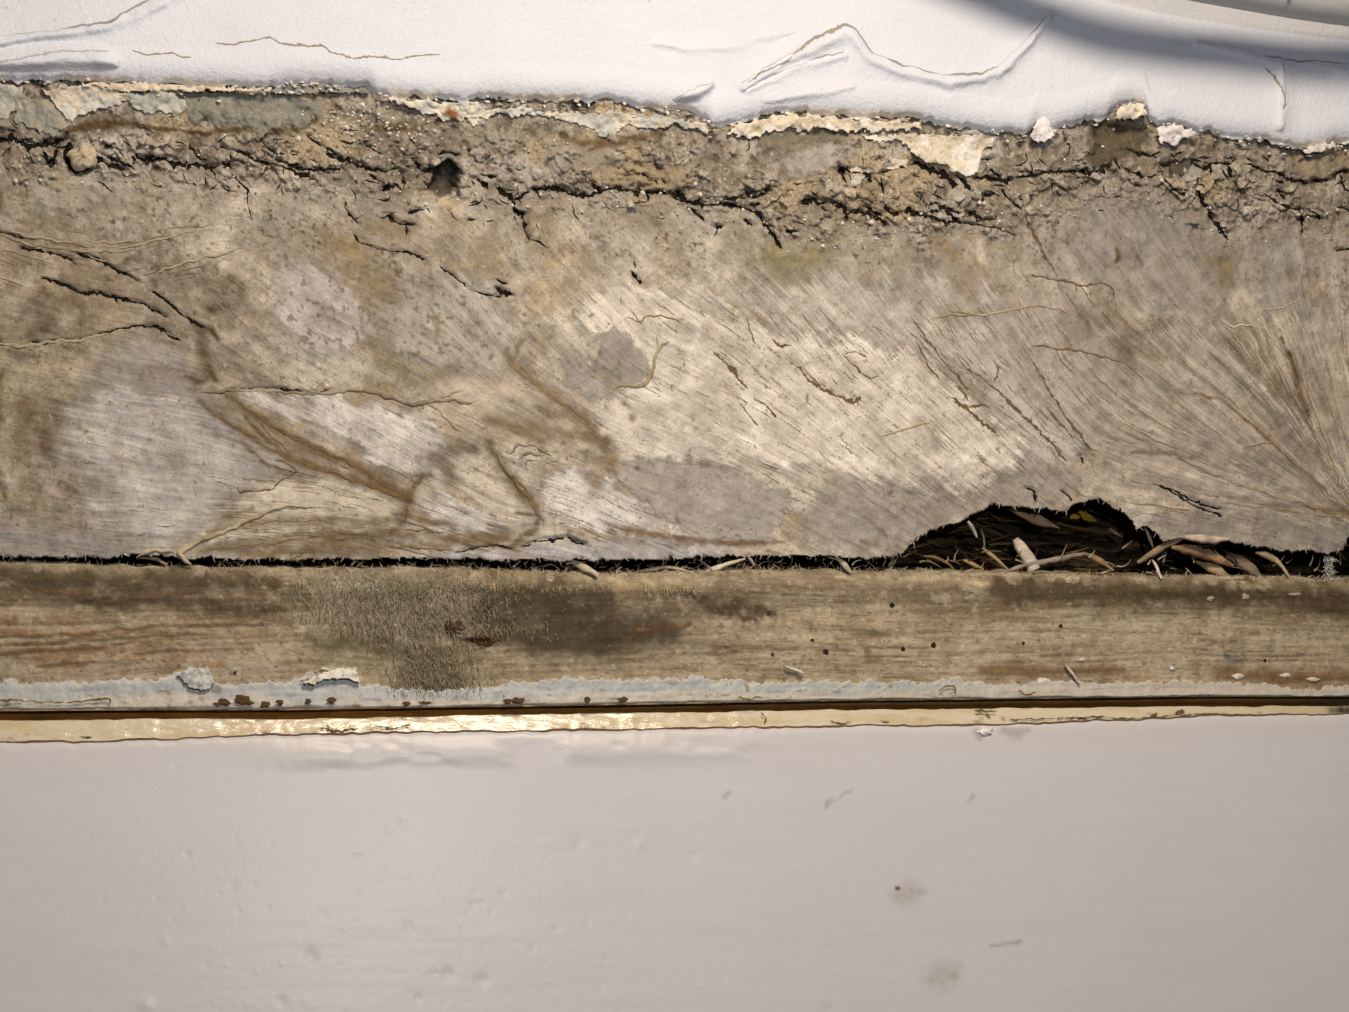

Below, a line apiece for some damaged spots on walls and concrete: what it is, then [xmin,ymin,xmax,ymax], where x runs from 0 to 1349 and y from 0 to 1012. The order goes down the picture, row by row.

spalling [0,79,1349,244]
crack [0,110,1349,298]
leakage [482,323,617,471]
leakage [0,364,698,703]
leakage [834,574,990,589]